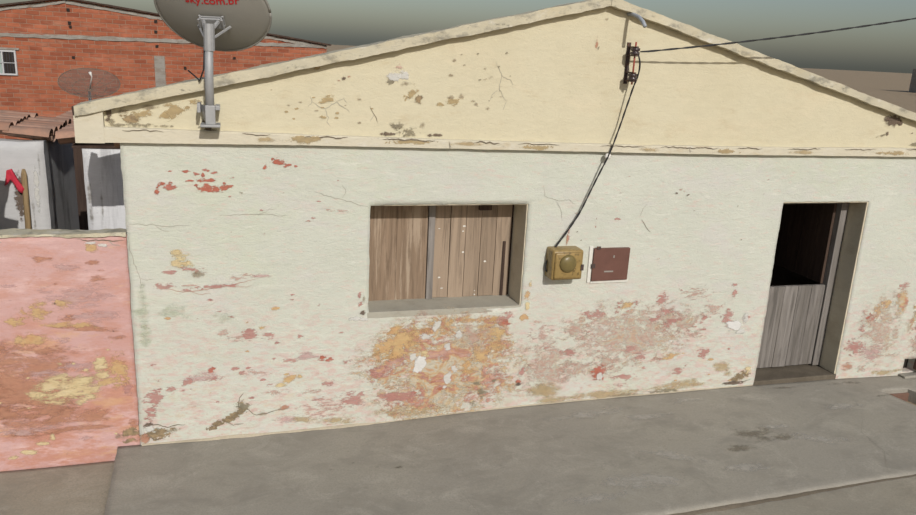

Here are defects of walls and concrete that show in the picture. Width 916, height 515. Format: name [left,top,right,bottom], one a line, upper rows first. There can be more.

spalling [387,66,423,104]
peeling [154,169,243,197]
peeling [155,250,269,301]
peeling [26,349,133,409]
spalling [114,367,217,443]
peeling [206,283,752,431]
peeling [844,282,916,372]